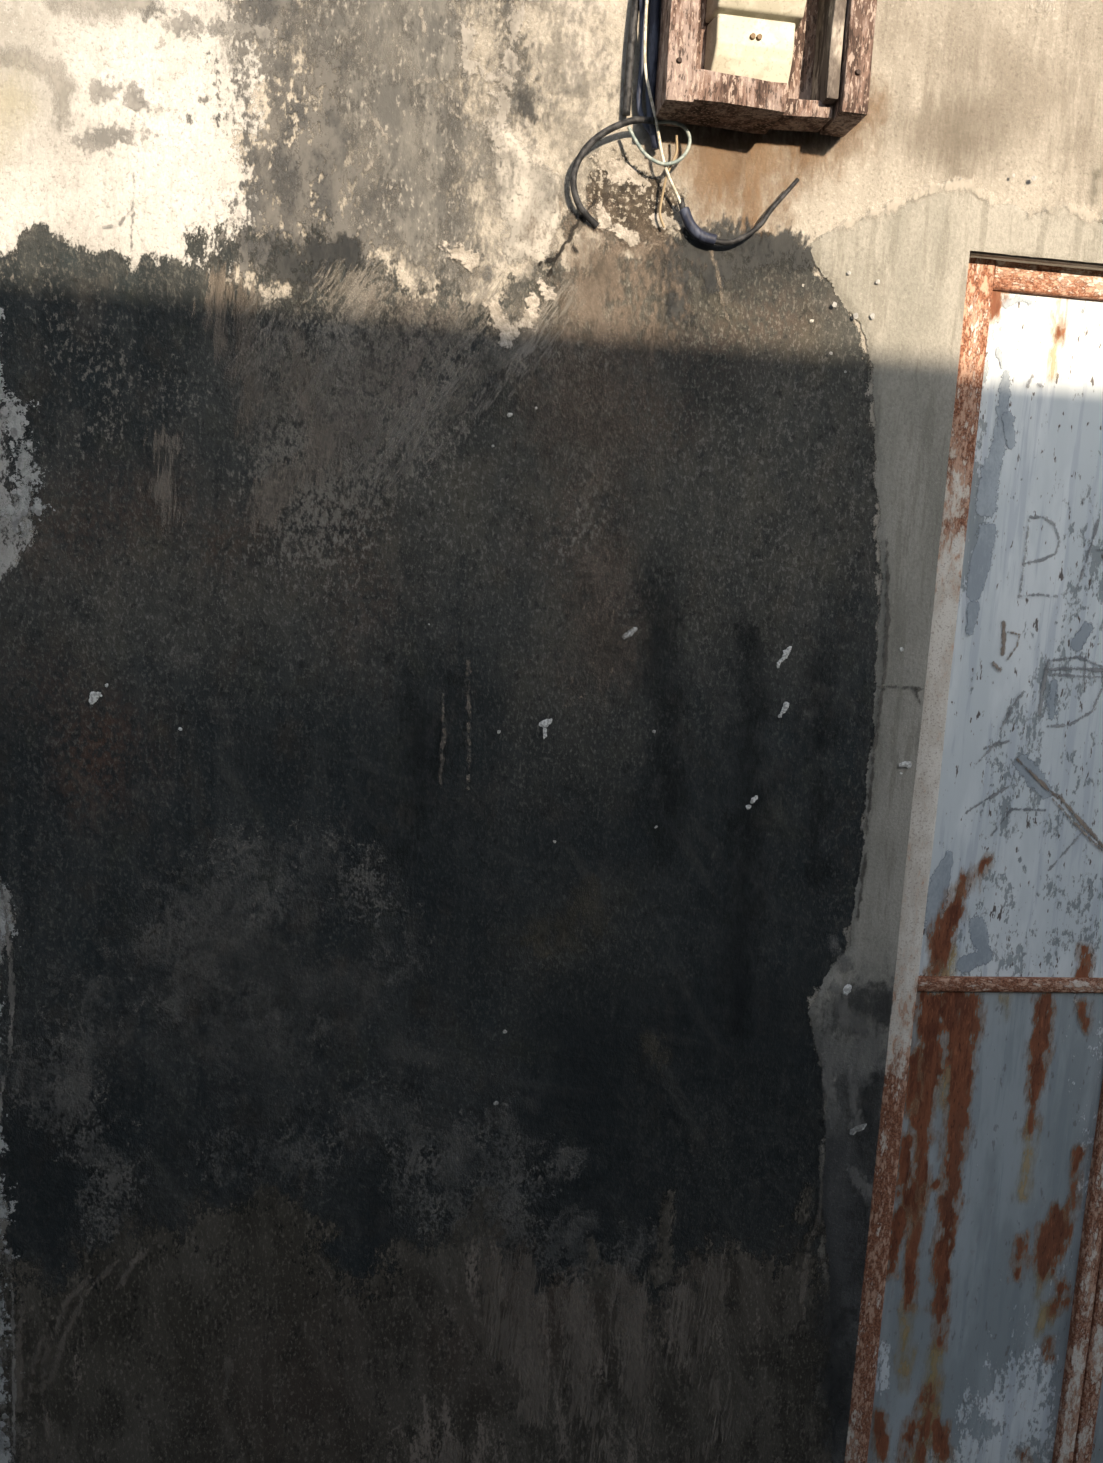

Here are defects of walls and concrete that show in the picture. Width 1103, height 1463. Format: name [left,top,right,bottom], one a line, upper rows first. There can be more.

damp [186,0,581,538]
damp [140,424,189,537]
damp [663,1241,742,1463]
damp [806,935,893,1455]
rust [873,856,993,1463]
rust [1018,993,1056,1199]
rust [1013,1145,1085,1361]
rust [1077,1000,1090,1032]
rust [1075,944,1093,978]